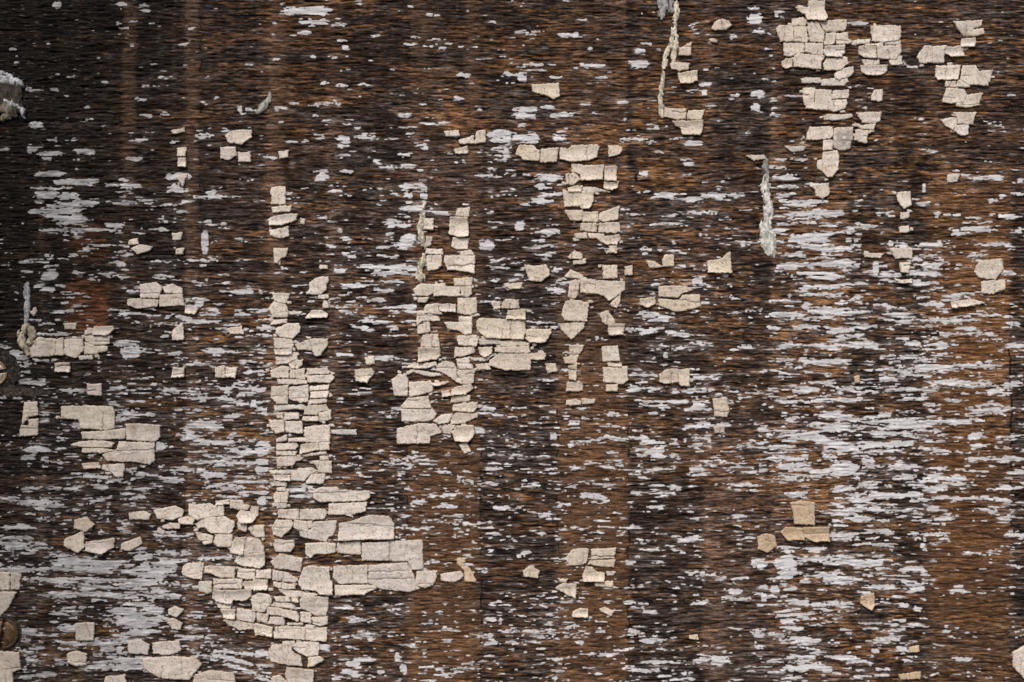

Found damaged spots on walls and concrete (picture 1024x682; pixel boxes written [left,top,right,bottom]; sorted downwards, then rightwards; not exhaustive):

peeling [628,42,661,69]
peeling [667,19,737,96]
peeling [573,63,612,87]
peeling [750,90,781,118]
peeling [313,169,352,197]
peeling [253,186,317,239]
peeling [264,248,296,274]
peeling [389,637,427,682]